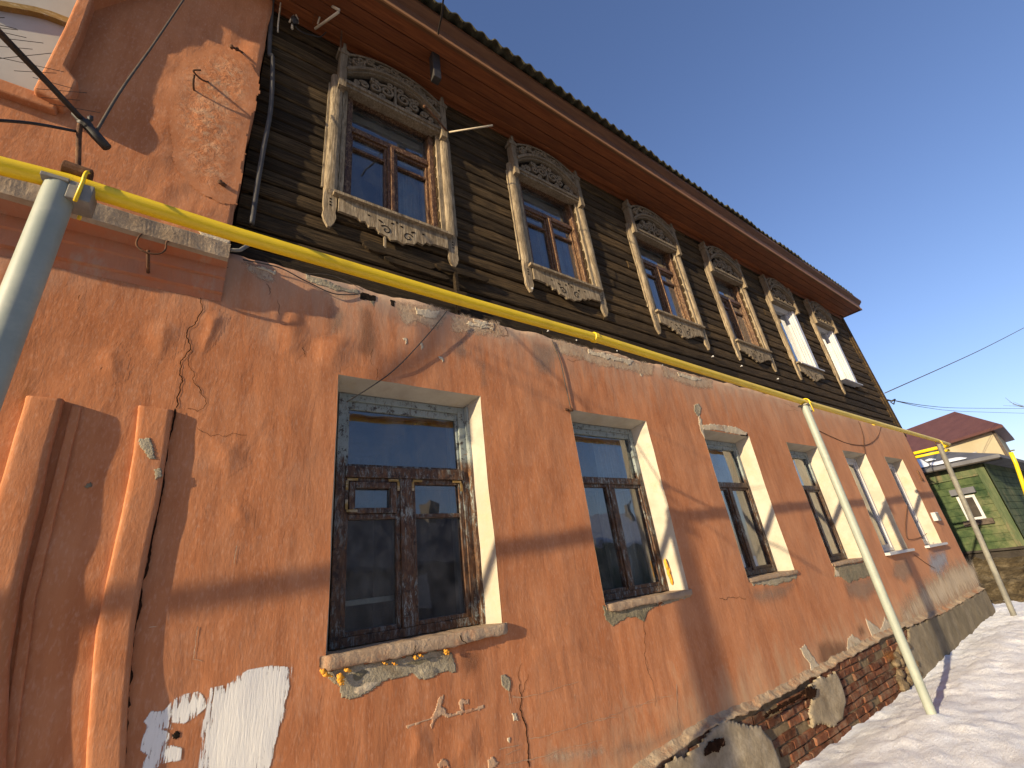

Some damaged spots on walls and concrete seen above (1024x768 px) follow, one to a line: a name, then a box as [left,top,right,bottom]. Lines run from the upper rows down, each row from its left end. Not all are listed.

peeling [390,300,503,337]
peeling [554,339,712,389]
spalling [694,404,748,439]
spalling [138,438,163,480]
crack [126,298,239,753]
spalling [834,561,870,583]
spalling [603,595,691,626]
spalling [328,650,456,700]
spalling [406,695,484,729]
crack [518,665,530,768]
flaking render [739,617,911,768]